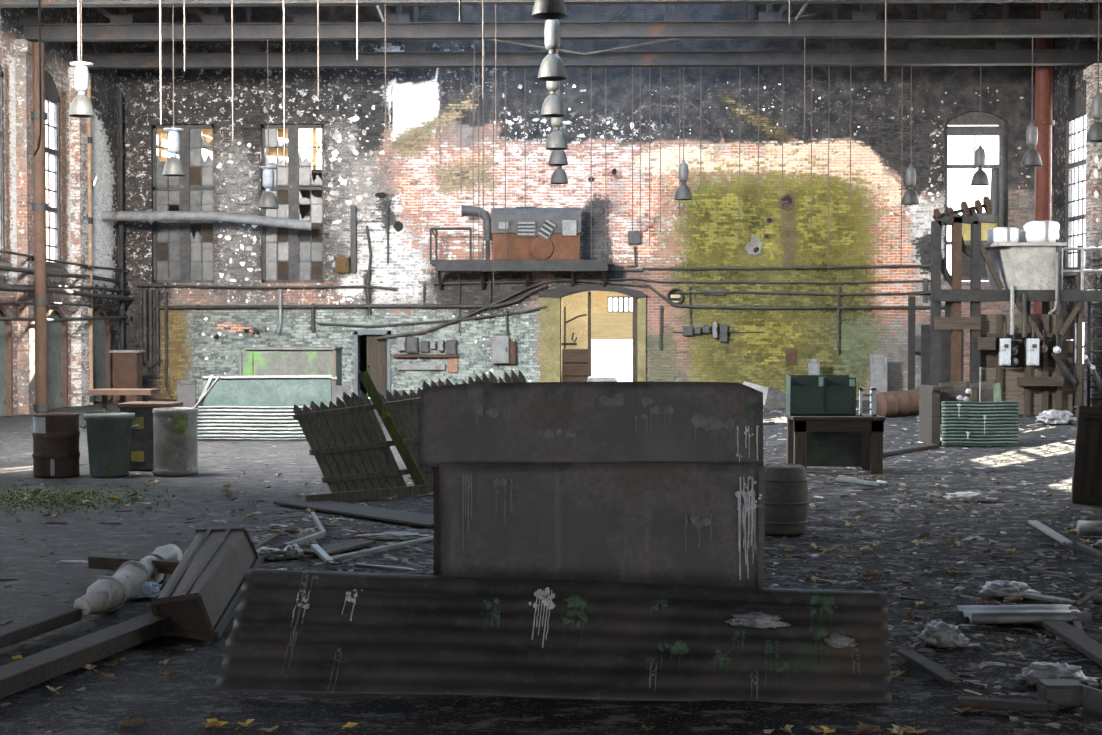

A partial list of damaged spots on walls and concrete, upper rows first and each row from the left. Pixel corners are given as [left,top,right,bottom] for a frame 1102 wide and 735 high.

peeling [370,43,404,52]
peeling [60,76,71,297]
peeling [91,96,148,300]
peeling [218,221,278,305]
spalling [297,69,940,321]